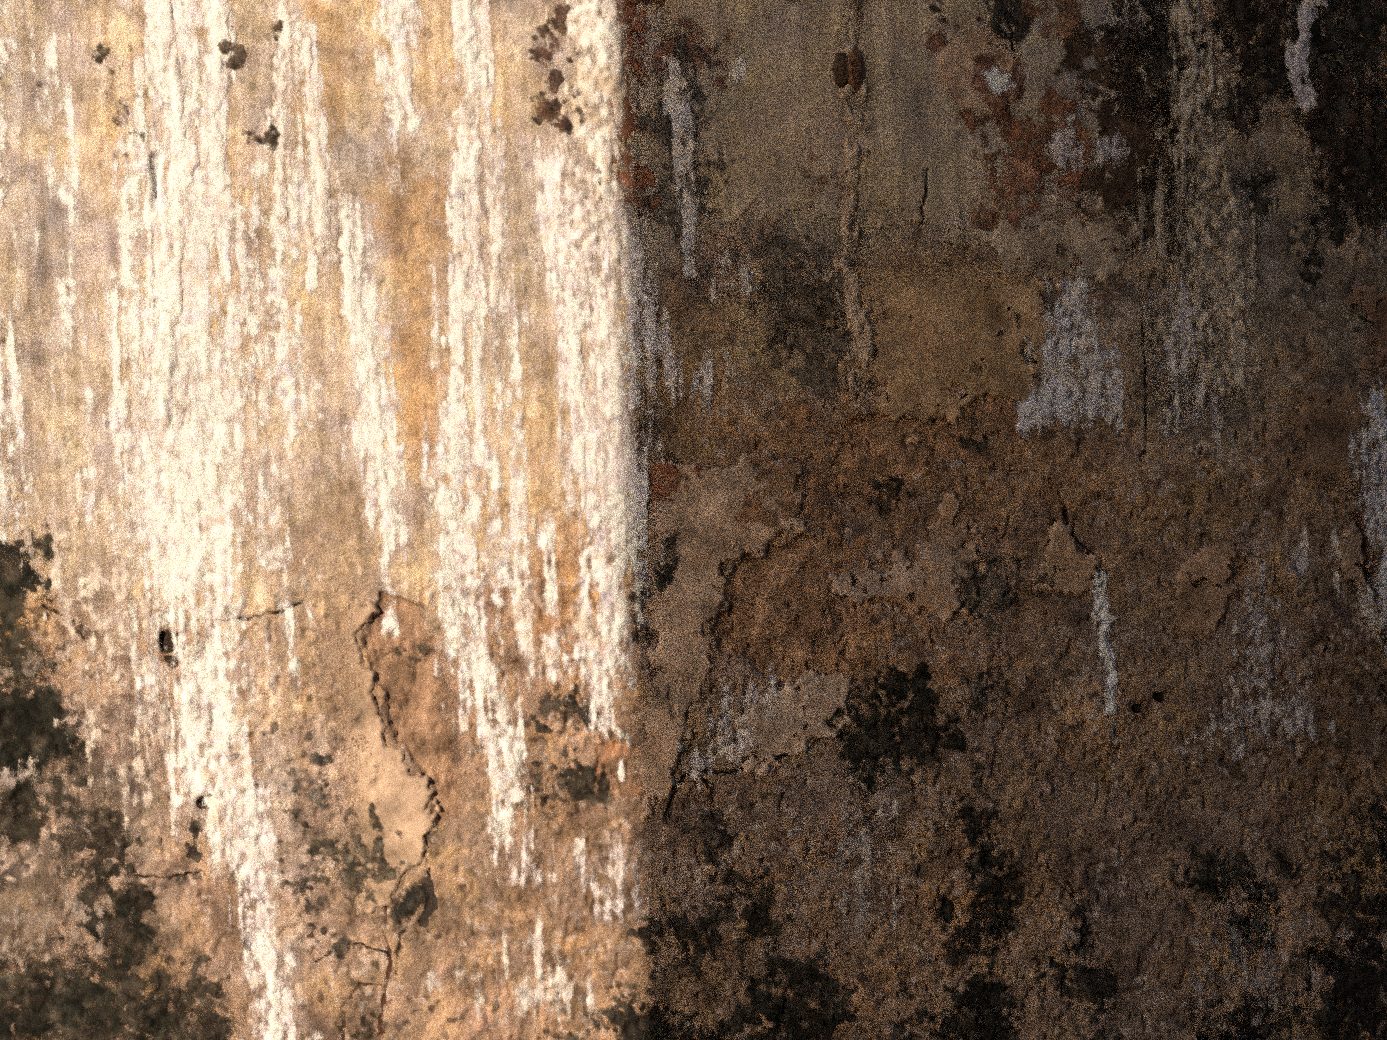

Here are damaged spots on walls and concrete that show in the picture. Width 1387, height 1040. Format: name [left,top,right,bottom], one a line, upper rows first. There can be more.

rust [599,0,733,217]
rust [924,13,989,52]
rust [958,51,1097,231]
rust [1014,0,1082,39]
water stain [1045,0,1387,453]
water stain [1016,265,1126,439]
water stain [0,0,1042,1040]
water stain [1348,382,1387,653]
peeling [595,450,986,822]
water stain [1090,571,1120,792]
crack [315,905,415,1040]
water stain [1168,790,1387,1040]